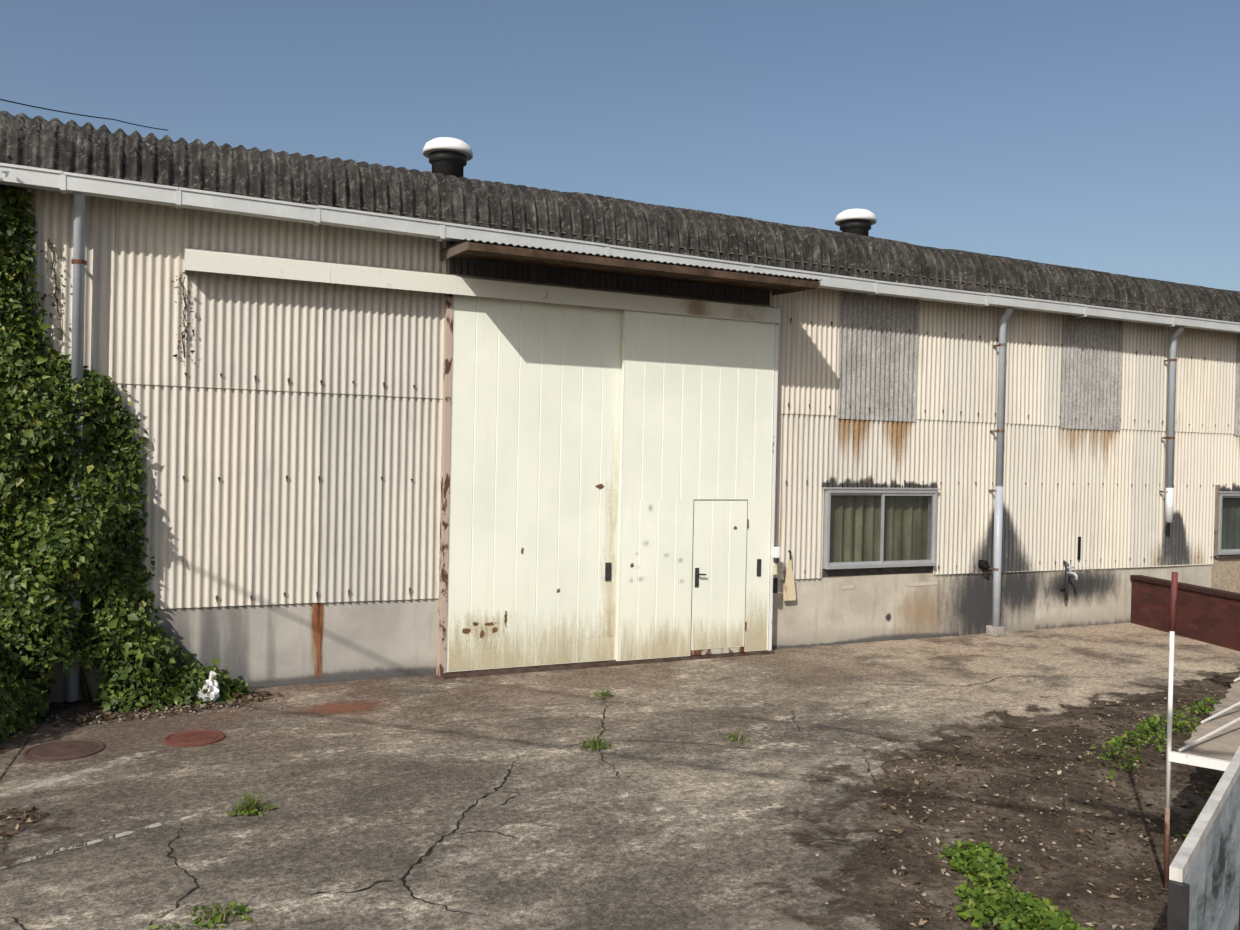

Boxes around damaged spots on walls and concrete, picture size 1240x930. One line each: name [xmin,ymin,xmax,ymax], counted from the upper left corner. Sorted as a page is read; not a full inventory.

rust [840,406,871,448]
rust [888,408,909,456]
mould [822,476,937,488]
damp [954,507,1114,635]
rust [312,592,323,676]
damp [448,643,473,672]
damp [737,626,766,651]
crack [149,826,199,930]